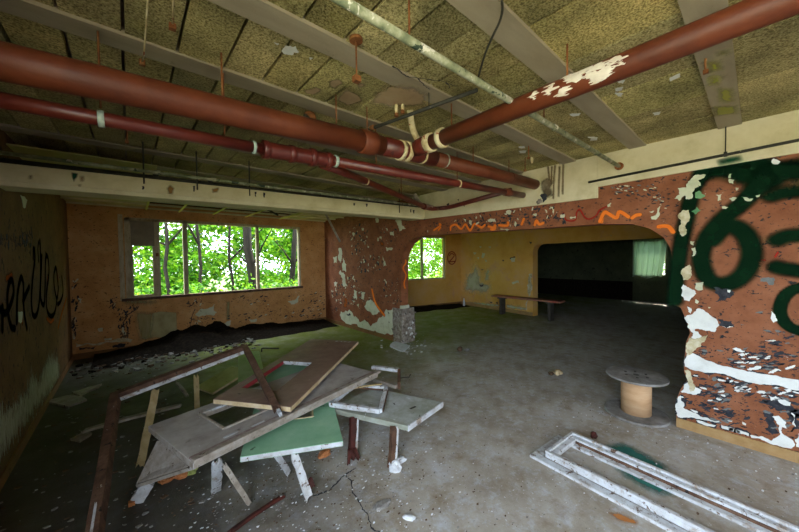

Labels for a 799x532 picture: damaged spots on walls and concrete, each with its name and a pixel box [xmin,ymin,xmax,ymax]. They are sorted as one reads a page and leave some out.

peeling [527,55,628,100]
peeling [452,194,576,231]
spalling [225,218,426,354]
peeling [607,174,799,448]
crack [313,468,380,532]